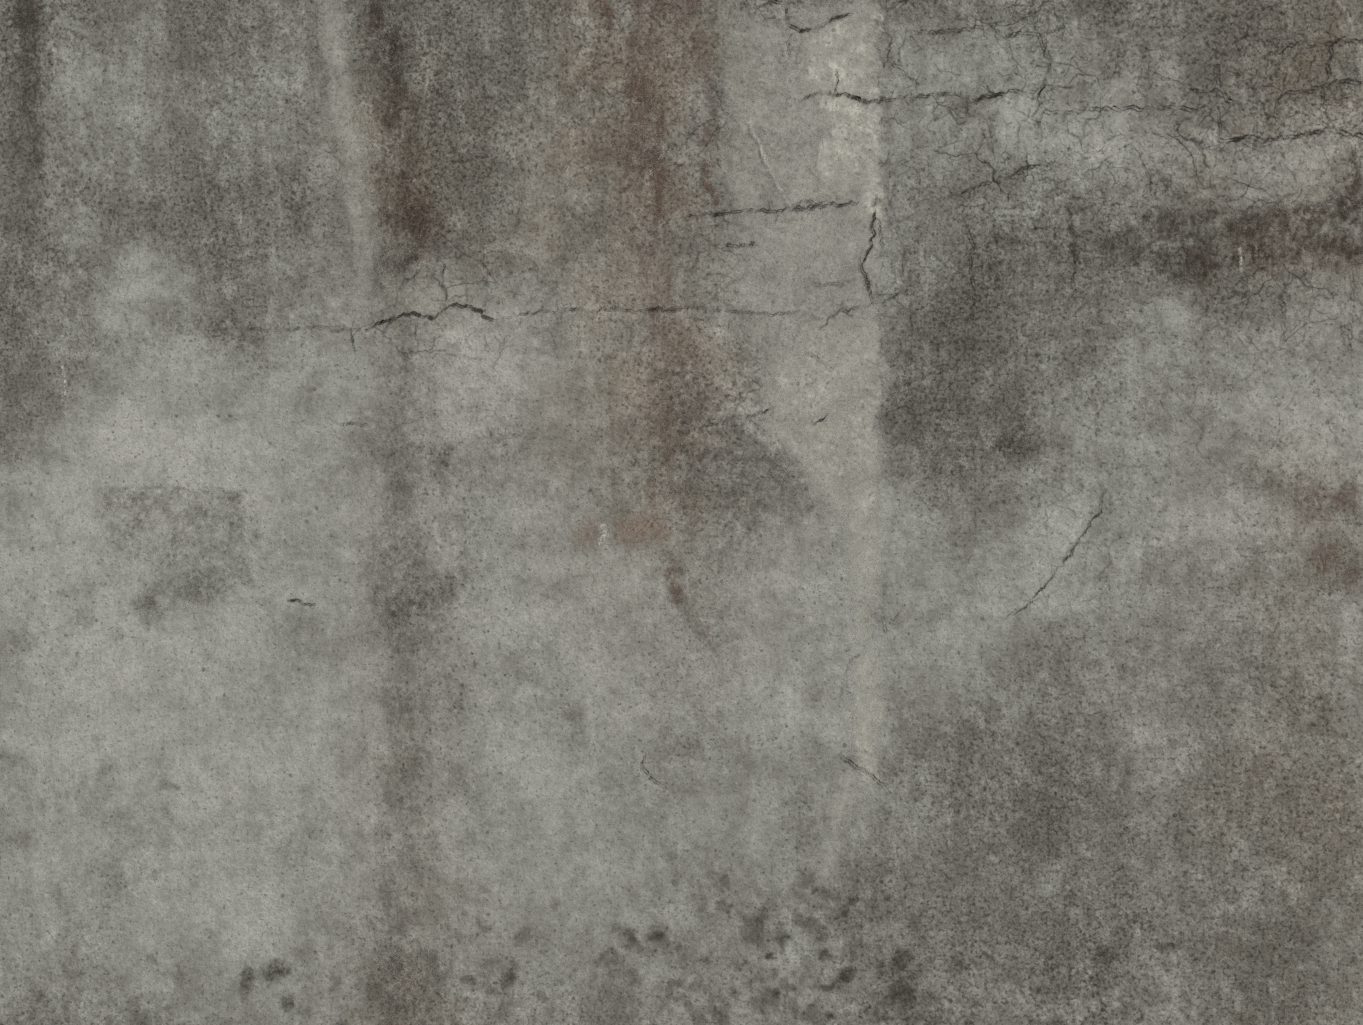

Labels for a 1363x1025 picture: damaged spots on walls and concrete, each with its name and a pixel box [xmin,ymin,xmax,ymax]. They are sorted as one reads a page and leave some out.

crack [746,0,853,52]
crack [807,0,1363,160]
leakage [734,10,884,276]
crack [953,162,1054,196]
leakage [1104,154,1362,277]
crack [241,264,785,348]
crack [690,194,899,385]
leakage [774,320,881,589]
leakage [830,968,854,989]